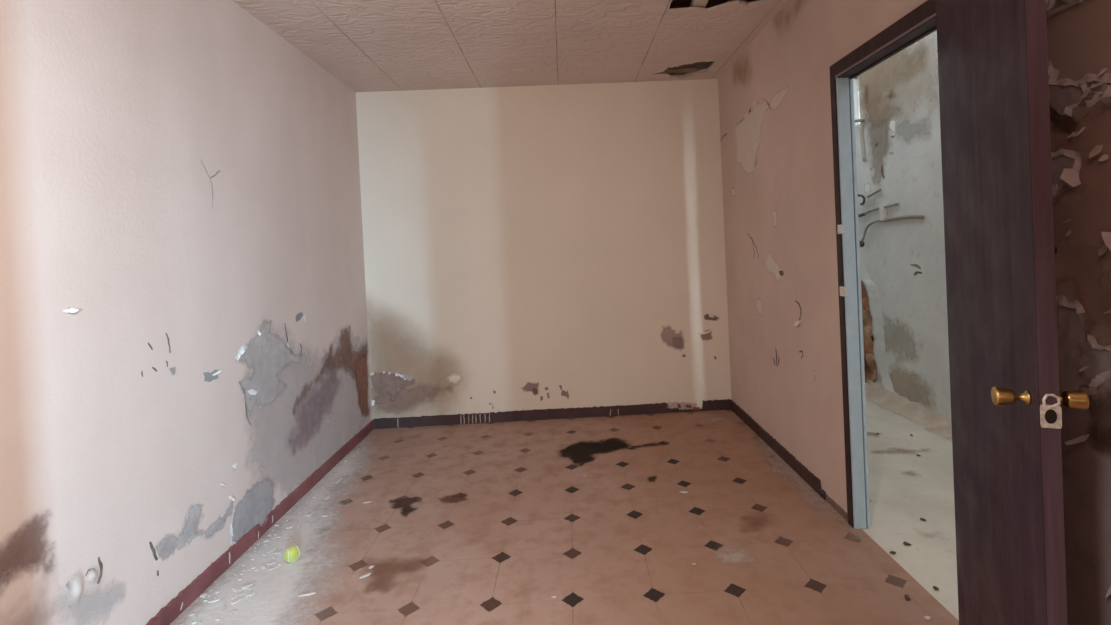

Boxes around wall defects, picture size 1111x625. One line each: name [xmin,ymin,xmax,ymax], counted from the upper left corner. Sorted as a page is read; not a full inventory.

crack [200,159,220,209]
peeling [1048,61,1111,197]
peeling [1098,232,1111,256]
peeling [235,312,306,425]
damp [292,321,447,451]
peeling [540,383,569,401]
peeling [149,460,347,621]